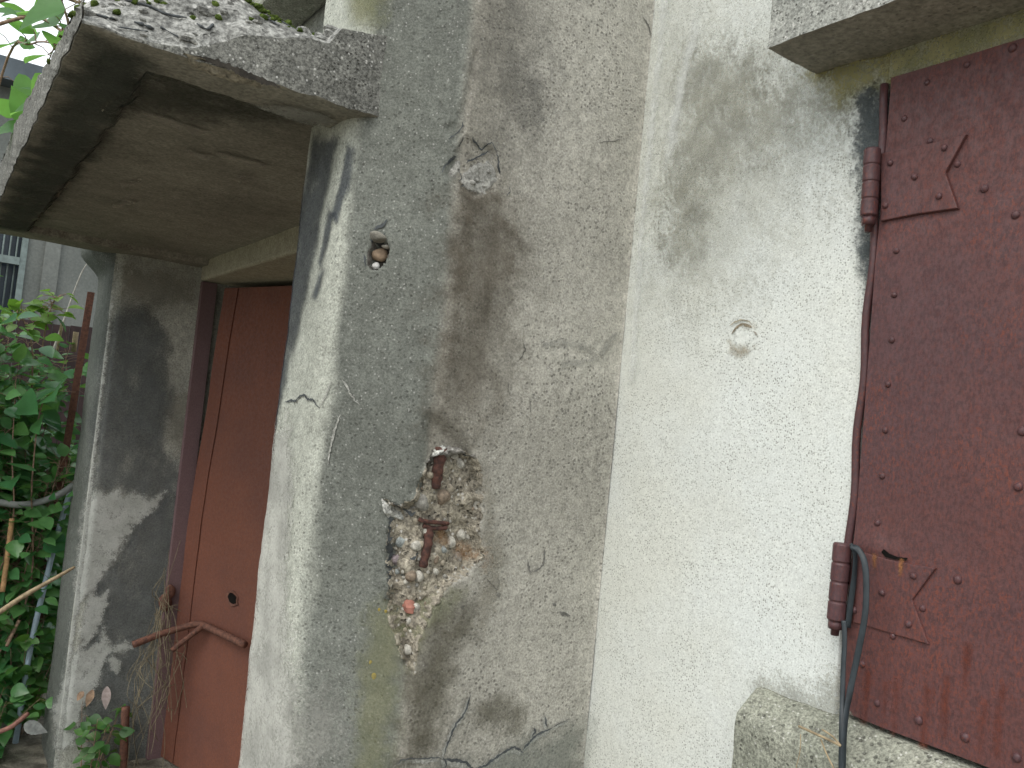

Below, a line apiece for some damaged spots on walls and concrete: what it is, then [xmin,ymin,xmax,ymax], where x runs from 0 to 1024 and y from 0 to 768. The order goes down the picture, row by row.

spalling [442,122,500,199]
spalling [364,219,390,270]
leakage [239,140,352,768]
crack [285,380,359,463]
leakage [54,290,178,765]
spalling [381,445,485,675]
crack [393,695,569,768]